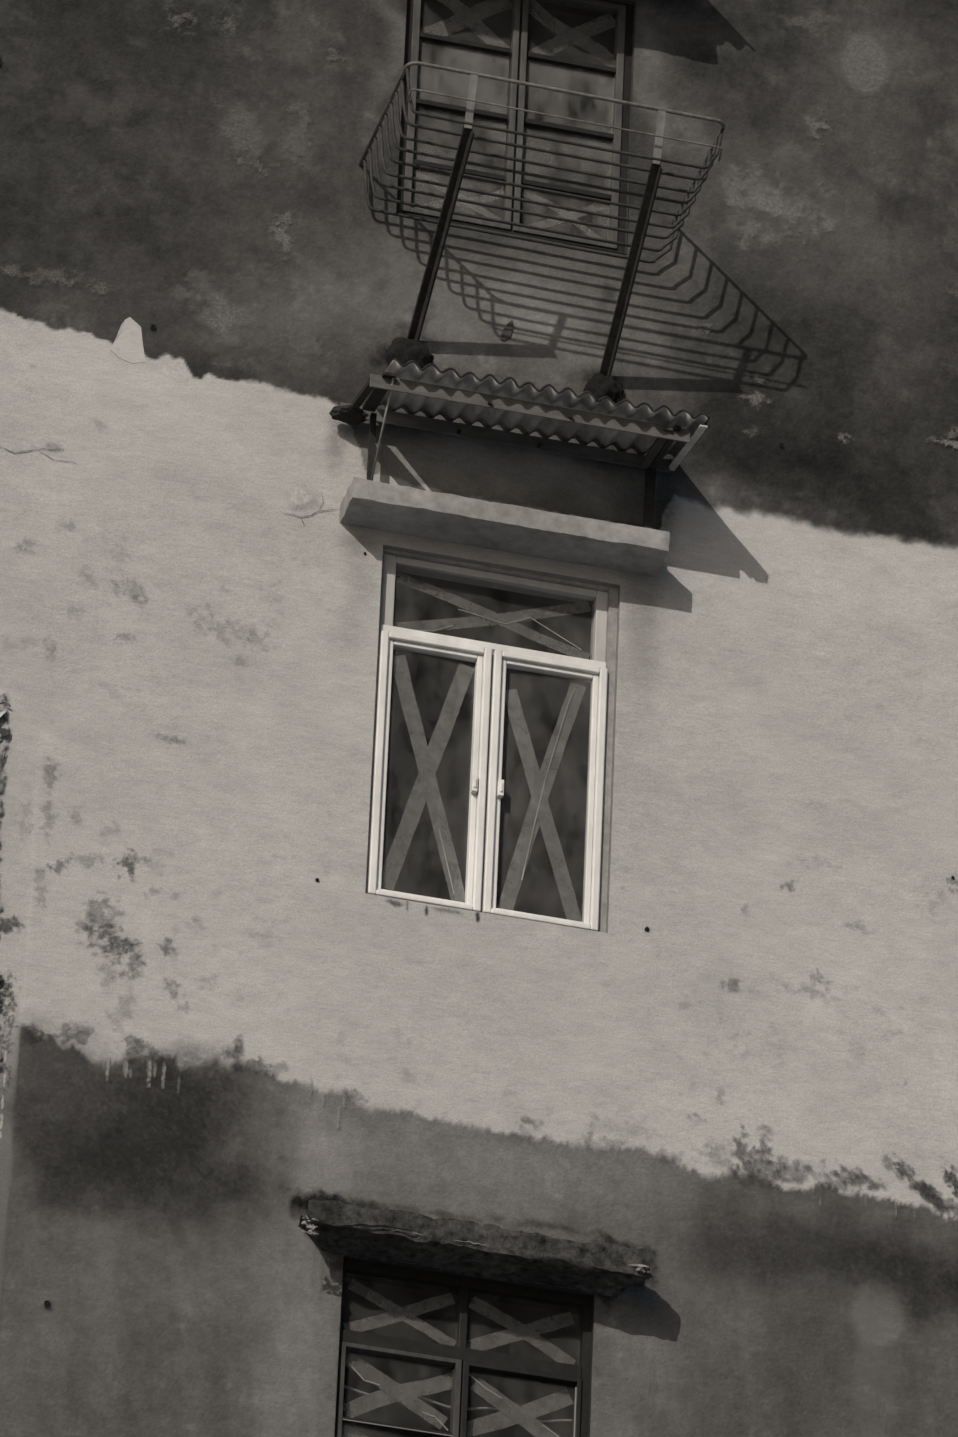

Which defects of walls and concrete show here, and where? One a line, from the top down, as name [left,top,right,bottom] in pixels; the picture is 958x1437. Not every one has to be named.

peeling [0,694,11,814]
peeling [0,902,19,932]
peeling [0,975,14,1139]
water stain [66,1061,243,1208]
peeling [834,1166,879,1189]
peeling [896,1162,958,1215]